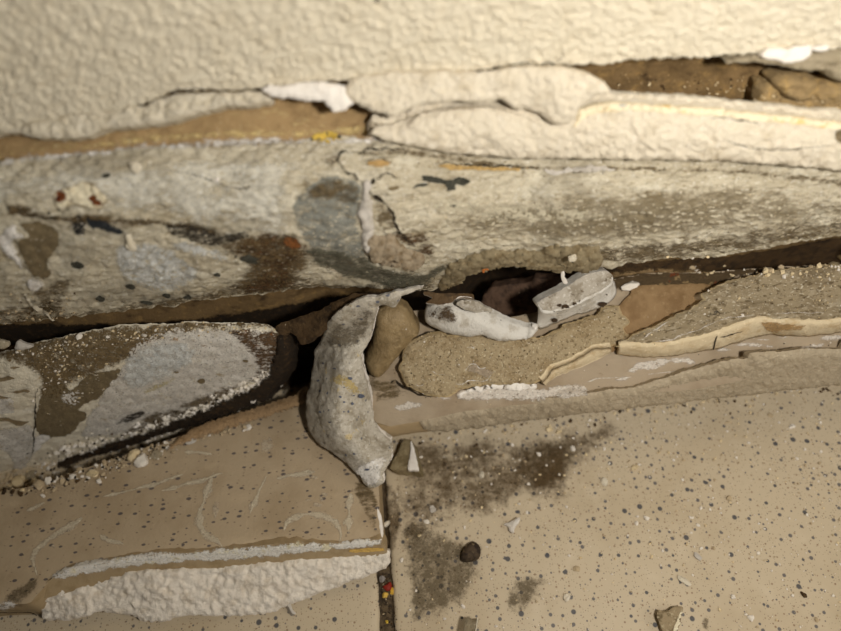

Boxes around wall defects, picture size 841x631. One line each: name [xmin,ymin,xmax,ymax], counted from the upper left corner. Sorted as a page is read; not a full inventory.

crack [473,56,563,72]
crack [170,86,235,94]
peeling [0,44,841,175]
crack [728,141,825,151]
peeling [18,221,59,280]
spalling [125,233,137,251]
peeling [456,299,492,313]
flaking render [0,339,34,350]
spalling [540,316,841,385]
peeling [36,369,120,438]
spalling [127,448,149,468]